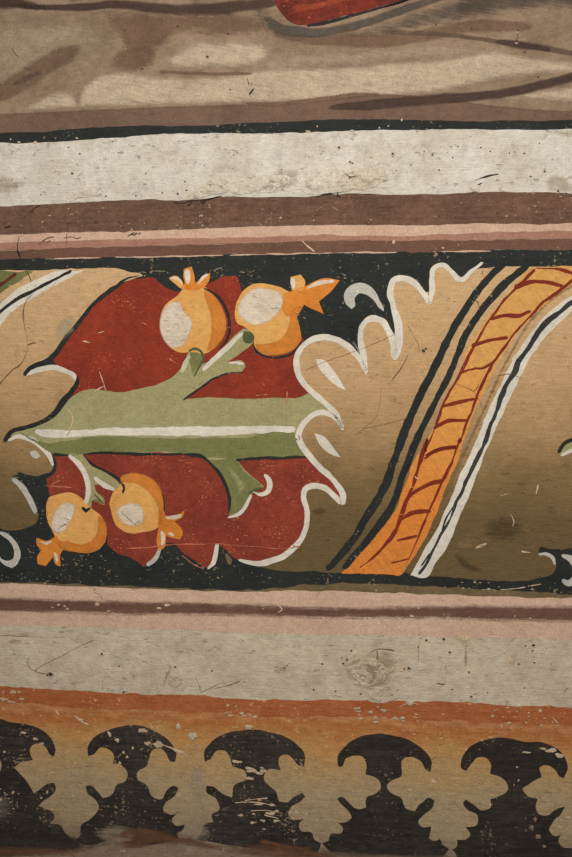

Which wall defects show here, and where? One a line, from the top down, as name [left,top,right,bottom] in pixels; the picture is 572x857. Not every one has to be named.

crack [0,206,81,384]
peeling [232,760,267,780]
peeling [238,799,279,830]